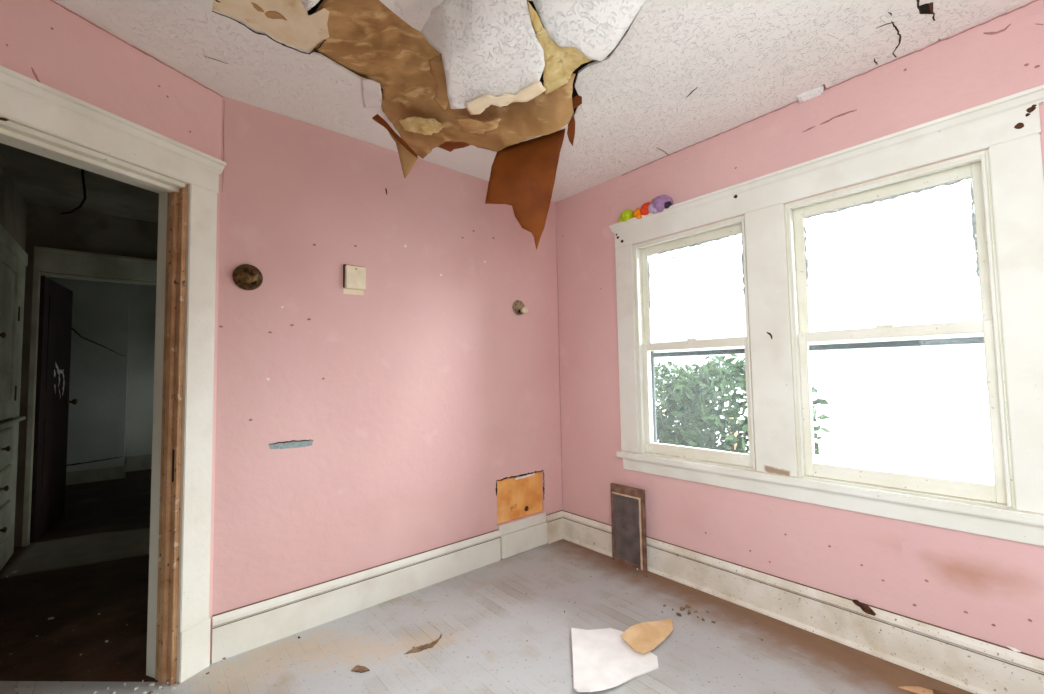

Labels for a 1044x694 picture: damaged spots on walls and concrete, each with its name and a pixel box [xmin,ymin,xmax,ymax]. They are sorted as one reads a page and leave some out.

peeling [212,0,330,54]
crack [824,0,1038,91]
crack [621,101,799,176]